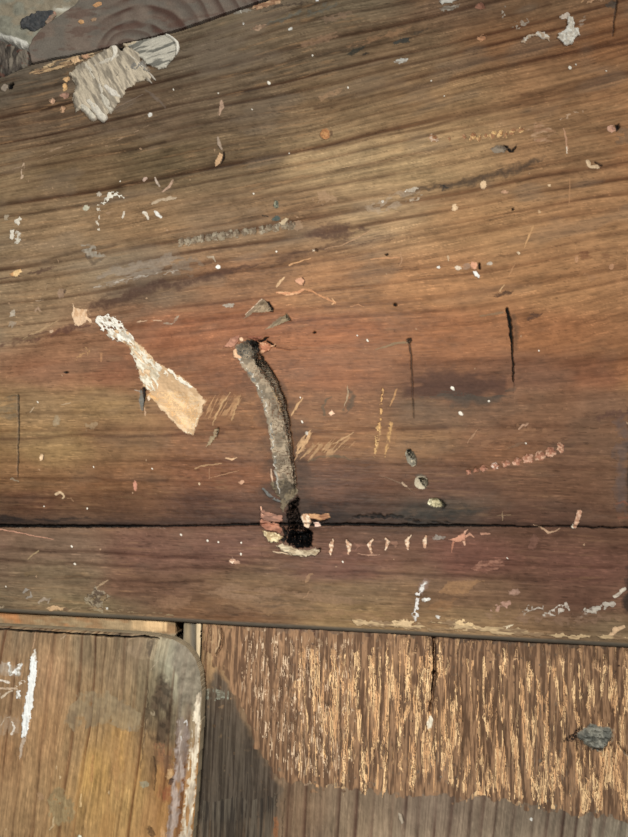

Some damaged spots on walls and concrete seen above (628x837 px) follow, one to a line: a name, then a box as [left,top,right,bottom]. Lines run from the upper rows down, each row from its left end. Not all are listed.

crack [0,513,261,529]
crack [283,512,628,529]
crack [427,640,439,730]